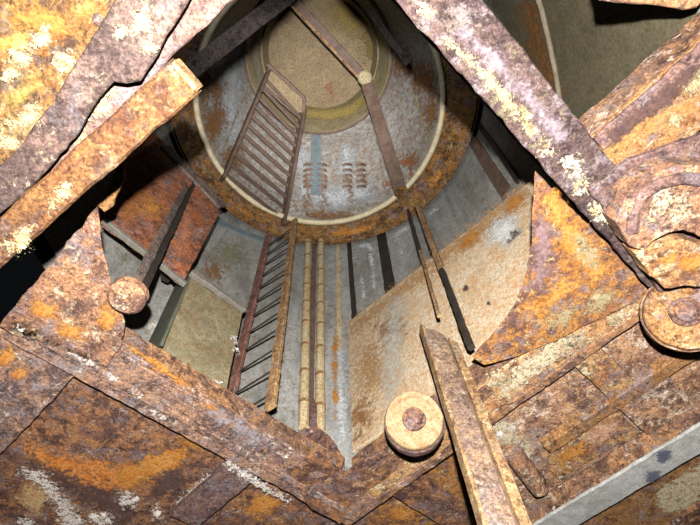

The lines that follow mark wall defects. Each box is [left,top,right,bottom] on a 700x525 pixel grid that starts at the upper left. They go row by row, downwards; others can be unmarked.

rust [199,69,232,144]
rust [394,45,440,133]
rust [303,176,368,219]
rust [519,188,613,324]
rust [658,252,700,273]
rust [31,298,85,342]
rust [97,304,117,339]
rust [331,184,532,442]
rust [0,344,28,379]
rust [129,346,193,393]
rust [205,404,263,445]
rust [15,434,204,525]